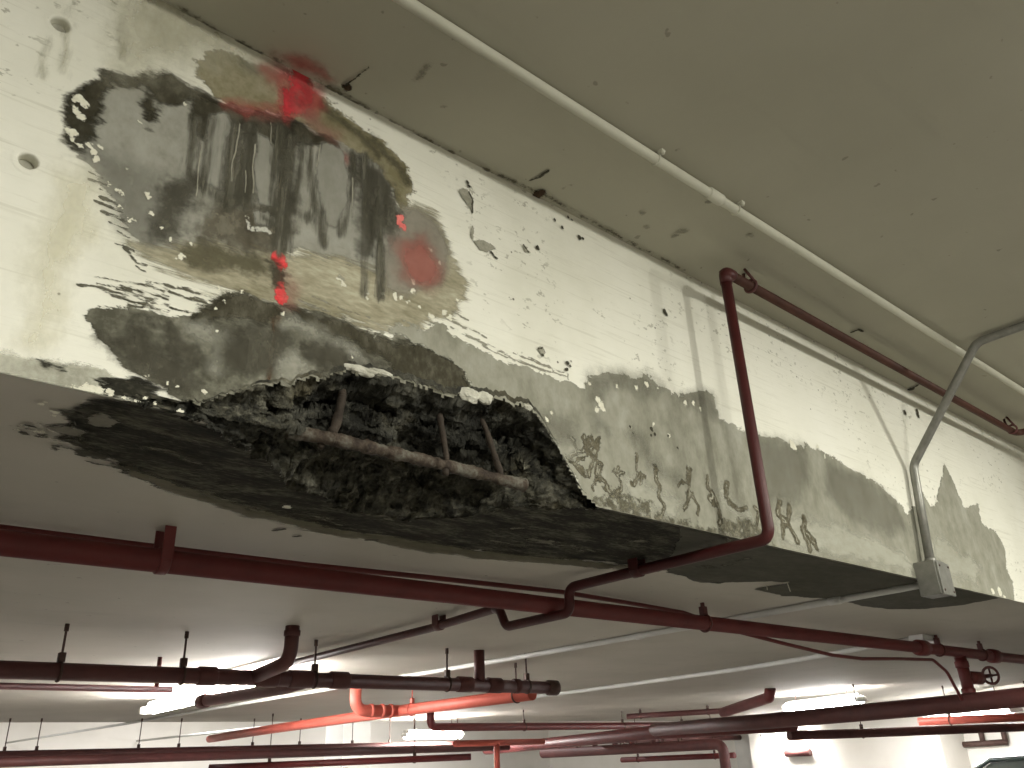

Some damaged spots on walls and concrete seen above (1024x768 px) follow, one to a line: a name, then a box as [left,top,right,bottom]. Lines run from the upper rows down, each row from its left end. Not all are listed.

leakage [14,3,1014,609]
spalling [0,349,594,522]
crack [562,433,819,554]